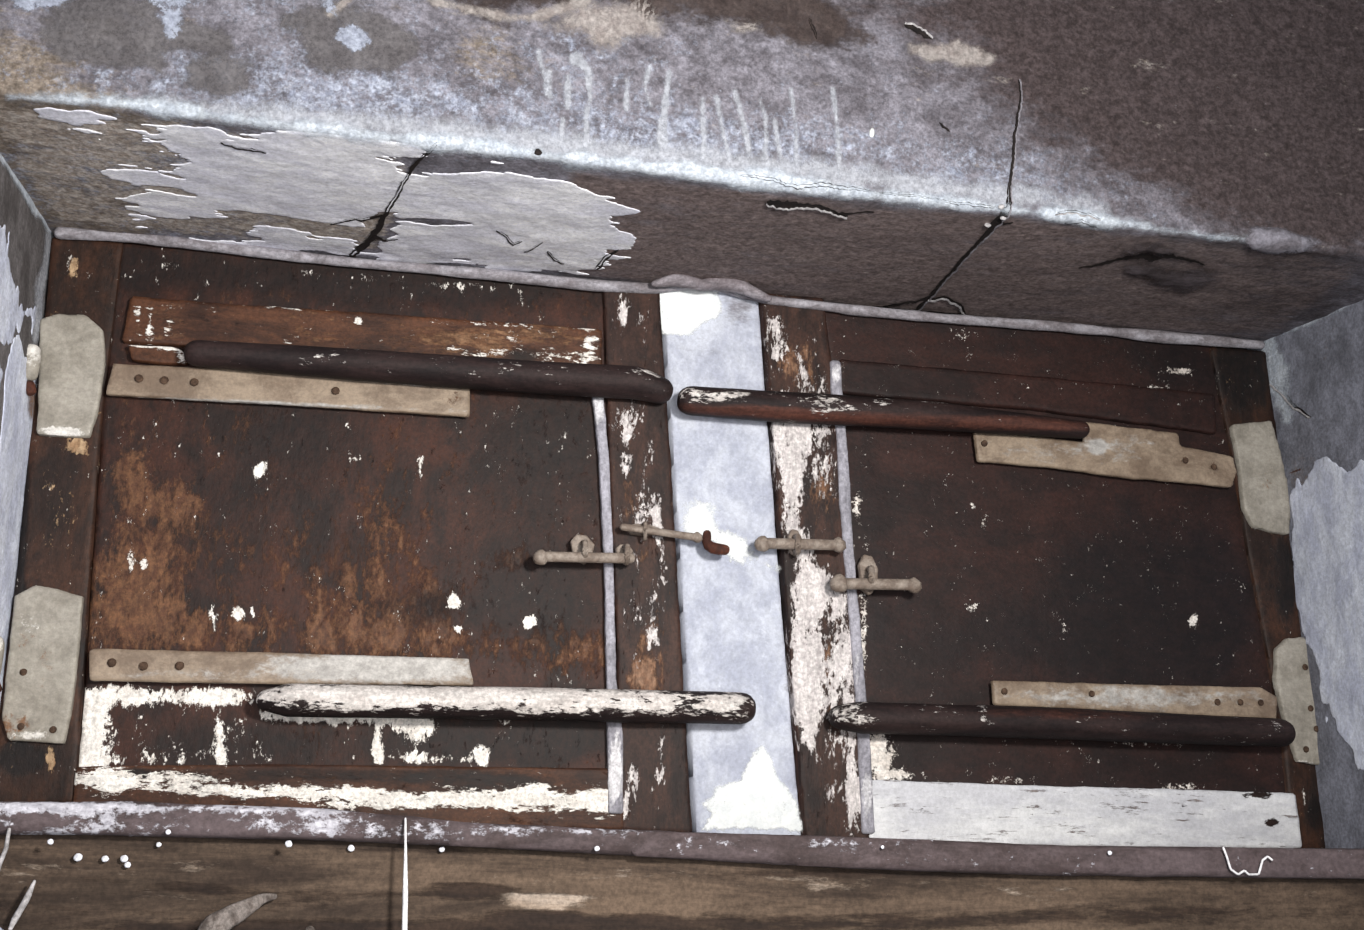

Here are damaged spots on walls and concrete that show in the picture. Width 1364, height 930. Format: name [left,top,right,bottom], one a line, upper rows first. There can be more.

peeling [33,107,641,275]
crack [330,142,437,258]
water stain [9,0,1156,230]
crack [741,79,1023,315]
peeling [0,225,38,702]
peeling [1289,457,1364,770]